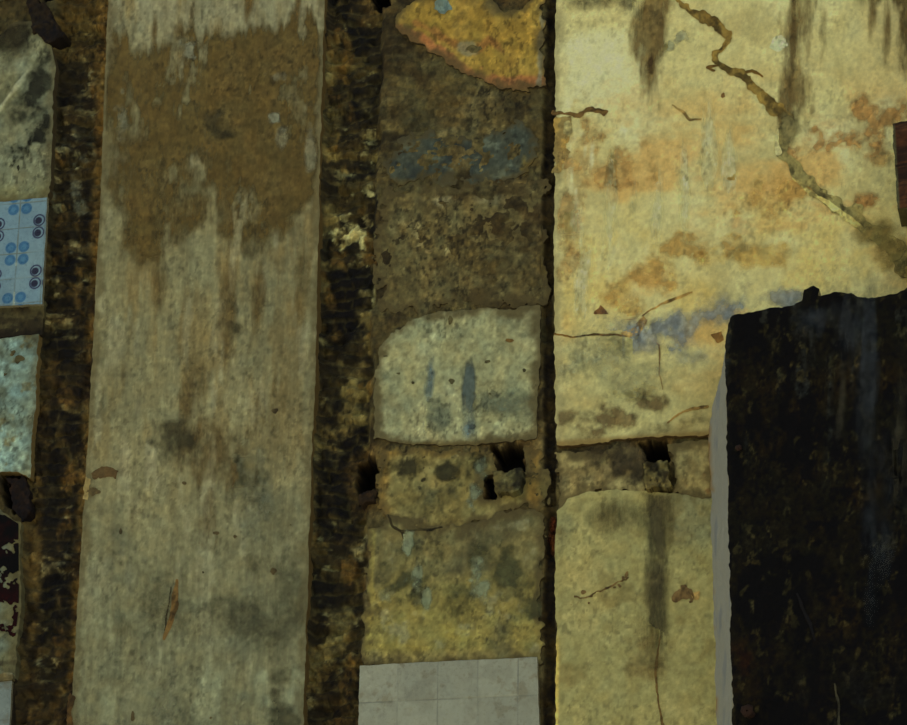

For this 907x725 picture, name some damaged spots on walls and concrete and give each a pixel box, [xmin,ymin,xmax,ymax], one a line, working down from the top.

leakage [574,0,670,91]
leakage [779,0,810,114]
leakage [870,0,890,46]
leakage [893,0,907,69]
leakage [106,0,320,291]
crack [672,0,907,278]
peeling [0,515,19,637]
crack [570,571,629,605]
leakage [644,495,670,646]
crack [654,636,665,725]